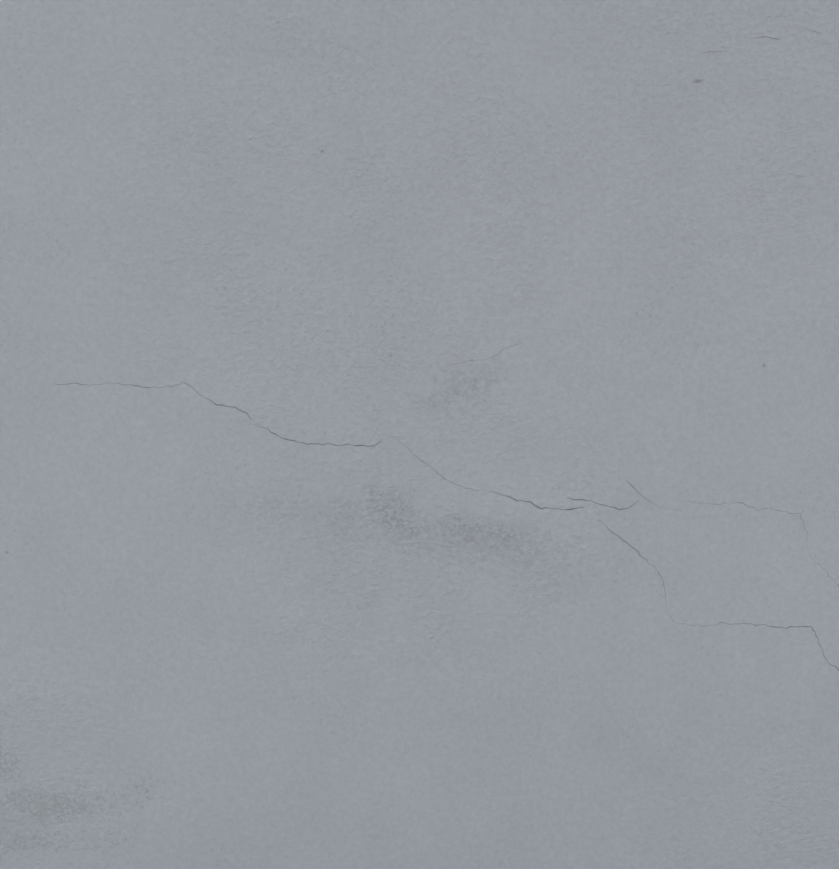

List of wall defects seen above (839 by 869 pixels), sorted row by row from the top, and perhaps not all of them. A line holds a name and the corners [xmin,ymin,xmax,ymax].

crack [57,382,839,671]